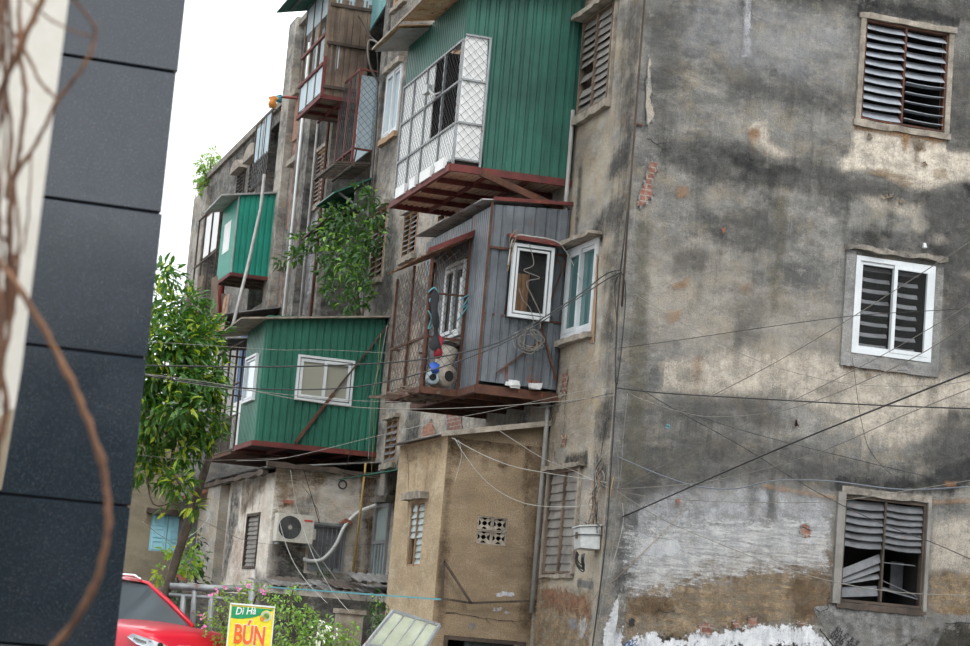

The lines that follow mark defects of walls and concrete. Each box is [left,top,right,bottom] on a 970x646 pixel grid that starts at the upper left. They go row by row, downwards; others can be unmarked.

leakage [807,0,970,26]
leakage [950,62,970,140]
leakage [664,139,970,369]
flaking render [623,488,825,581]
peeling [603,586,835,646]
leakage [624,530,833,641]
leakage [927,570,970,618]